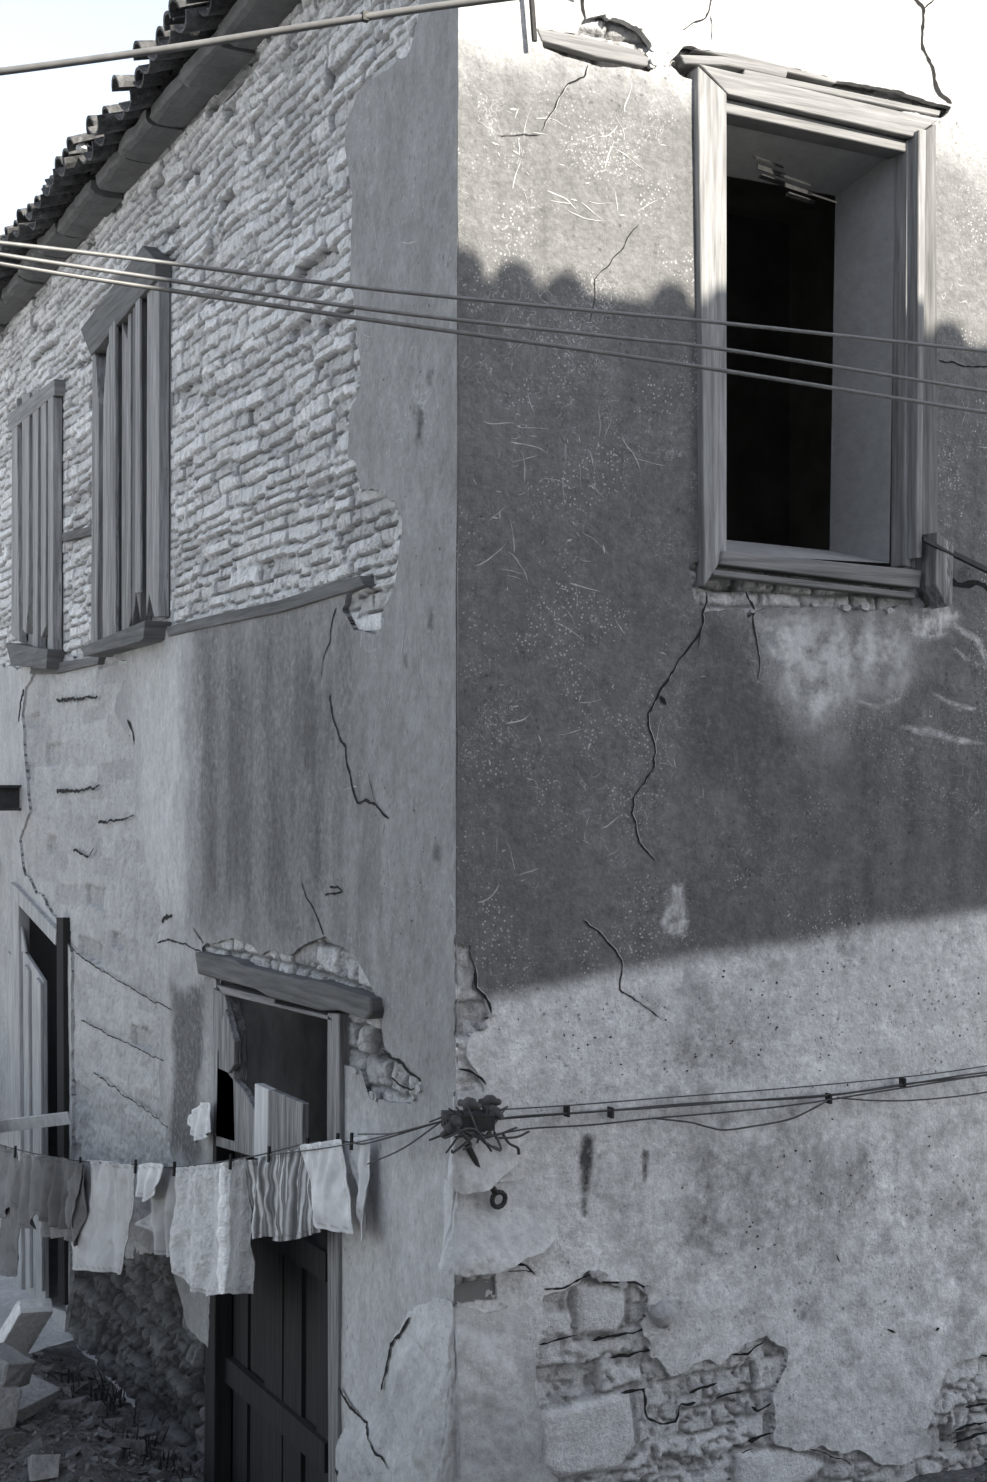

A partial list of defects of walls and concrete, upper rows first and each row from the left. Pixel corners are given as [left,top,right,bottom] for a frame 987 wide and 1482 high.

spalling [543,14,693,78]
crack [683,0,713,30]
spalling [830,84,946,118]
crack [915,0,953,104]
crack [745,591,761,677]
crack [953,578,987,590]
peeling [0,0,423,1482]
crack [321,608,389,832]
crack [631,595,708,860]
damp [693,607,982,787]
crack [583,920,659,1017]
spalling [535,1270,987,1482]